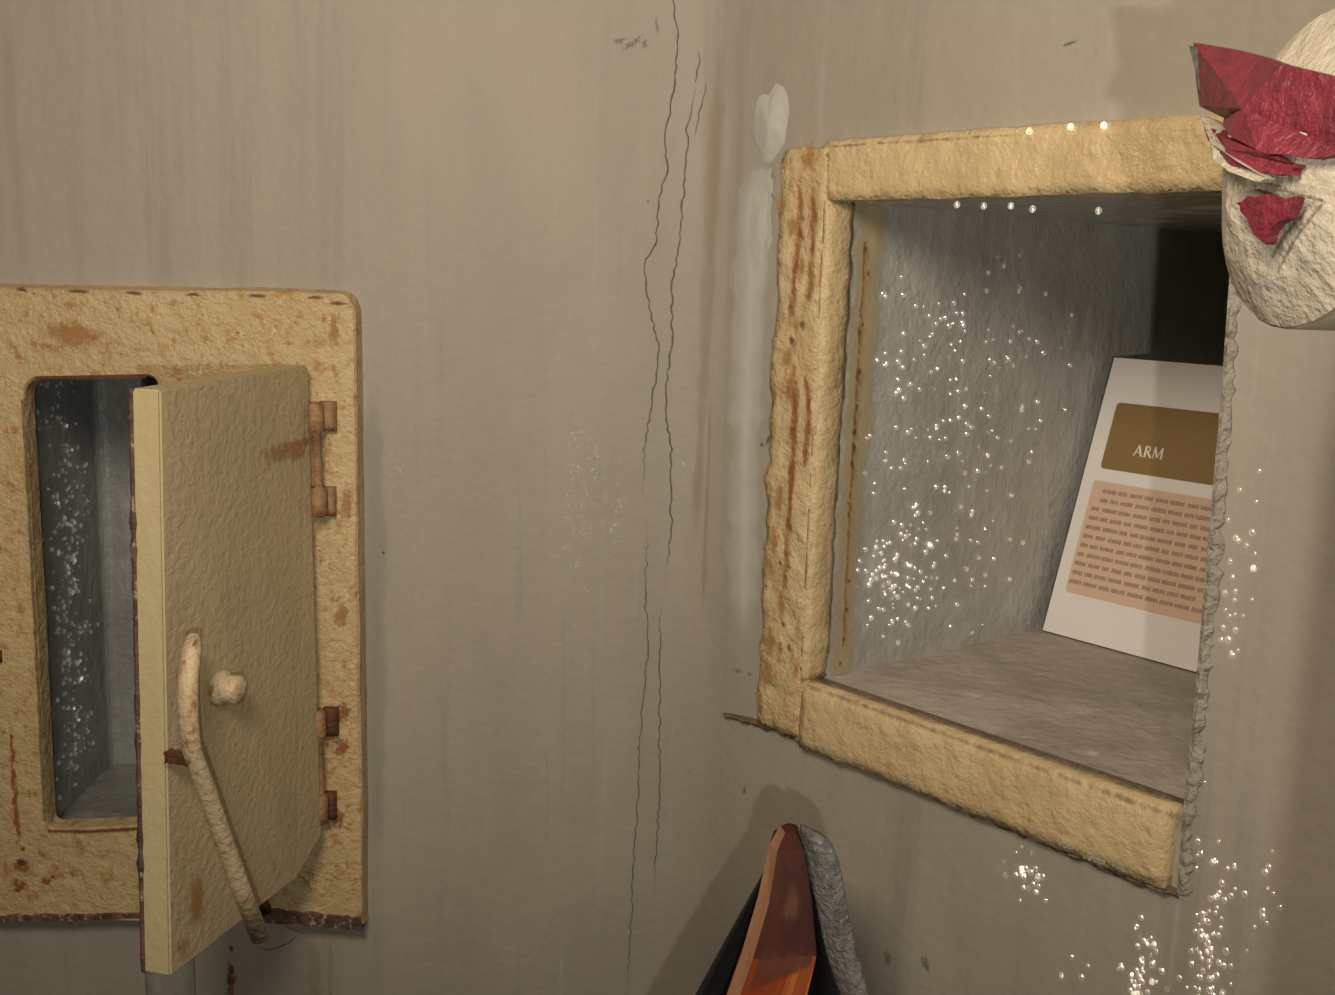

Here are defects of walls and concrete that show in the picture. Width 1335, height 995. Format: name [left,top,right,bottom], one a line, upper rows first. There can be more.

crack [628,1,706,966]
rust [756,187,817,707]
rust [842,242,870,645]
rust [9,735,29,892]